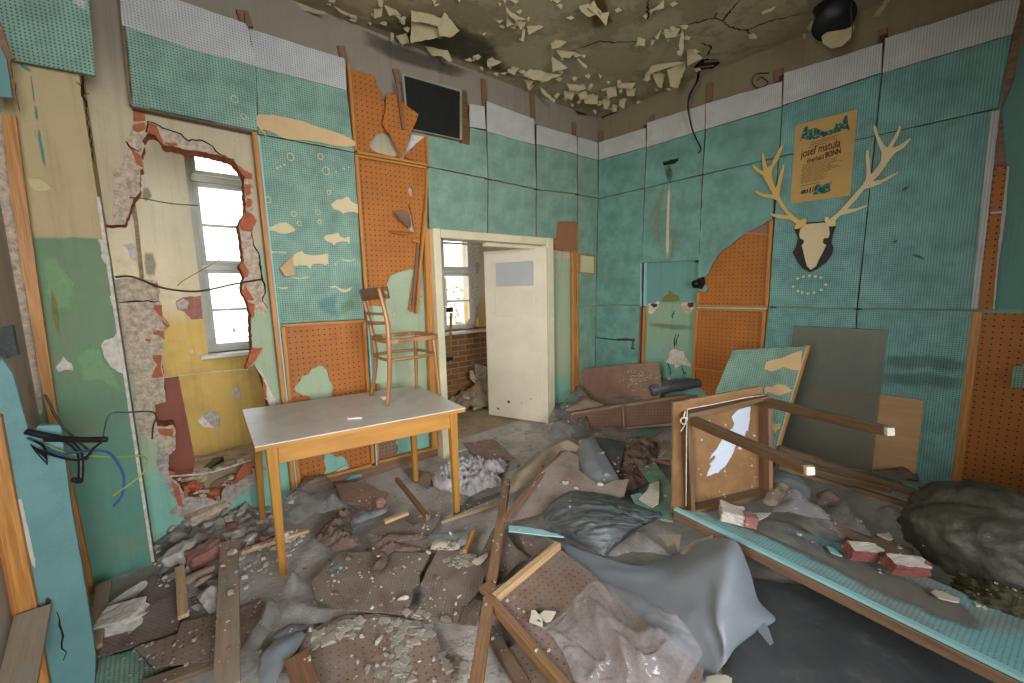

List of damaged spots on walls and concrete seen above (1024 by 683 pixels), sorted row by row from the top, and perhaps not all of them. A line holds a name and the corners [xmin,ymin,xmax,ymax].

peeling [297,0,459,62]
peeling [497,0,543,42]
peeling [550,0,622,25]
peeling [643,0,678,19]
crack [688,2,799,57]
peeling [465,25,720,120]
spalling [113,112,220,225]
spalling [234,160,267,318]
crack [251,232,268,309]
spalling [101,278,267,520]
flaking render [246,329,276,406]